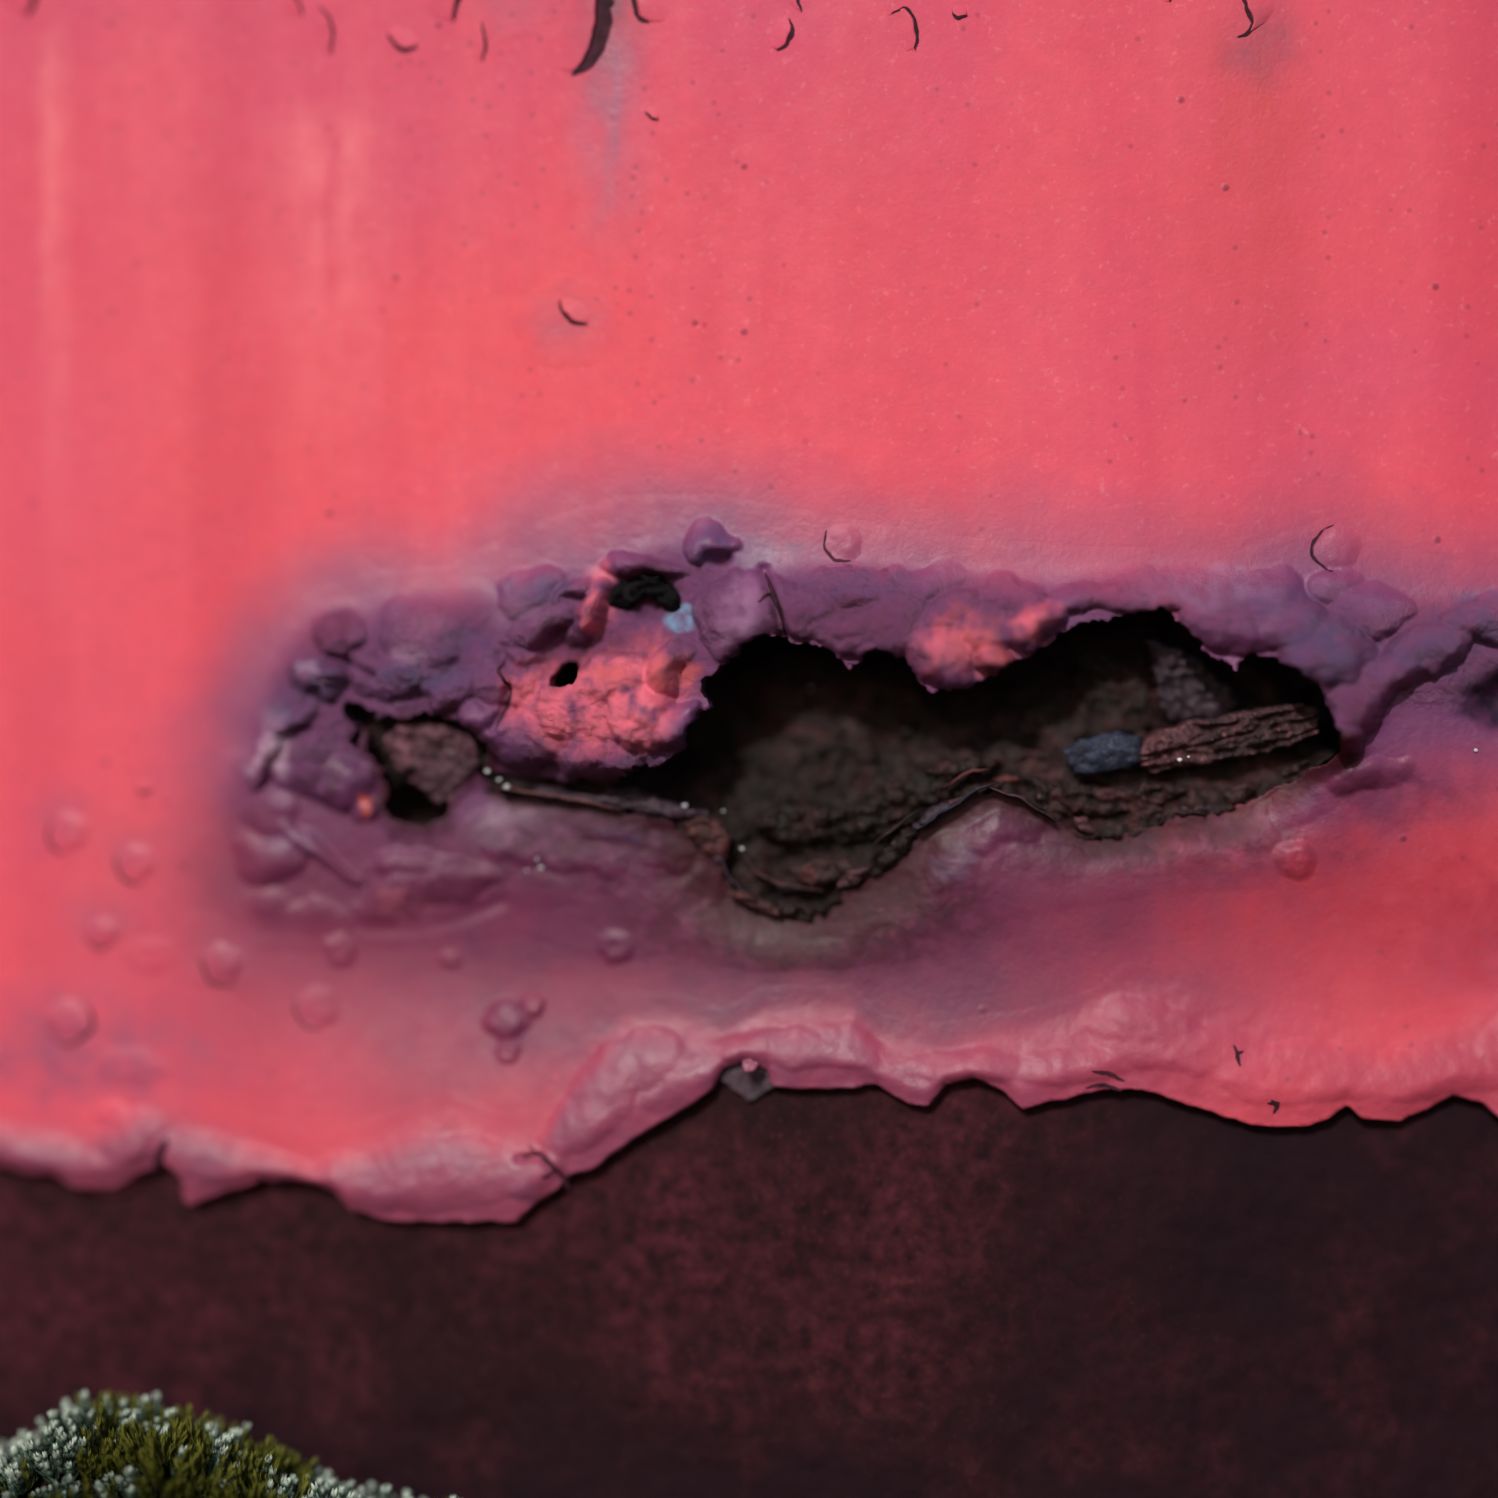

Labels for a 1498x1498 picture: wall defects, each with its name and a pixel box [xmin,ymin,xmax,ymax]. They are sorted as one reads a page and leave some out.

peeling [387,26,418,52]
peeling [559,0,670,76]
peeling [770,0,802,50]
peeling [886,6,919,52]
peeling [952,5,967,19]
peeling [1237,0,1274,37]
spalling [349,607,1343,919]
corrosion [535,785,734,873]
corrosion [754,755,1256,890]
corrosion [730,890,816,922]
peeling [0,961,1498,1223]